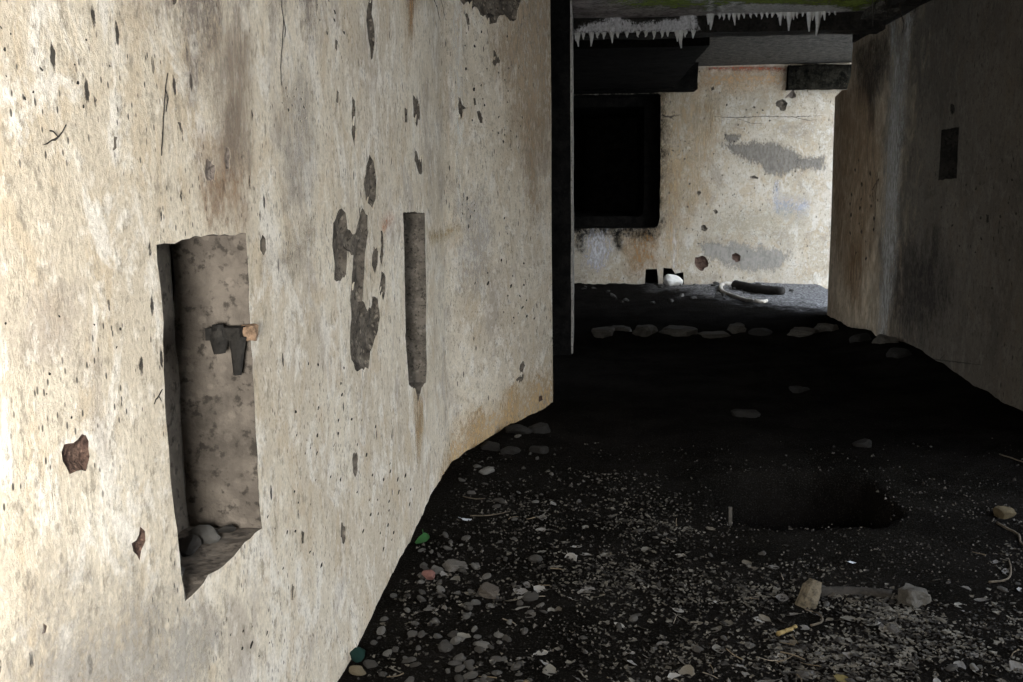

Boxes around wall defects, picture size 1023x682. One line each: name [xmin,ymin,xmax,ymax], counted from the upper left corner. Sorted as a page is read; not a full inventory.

spalling [366,0,377,59]
flaking render [460,0,521,48]
leakage [574,0,876,33]
spalling [332,155,386,372]
peeling [695,238,791,272]
spalling [62,434,90,474]